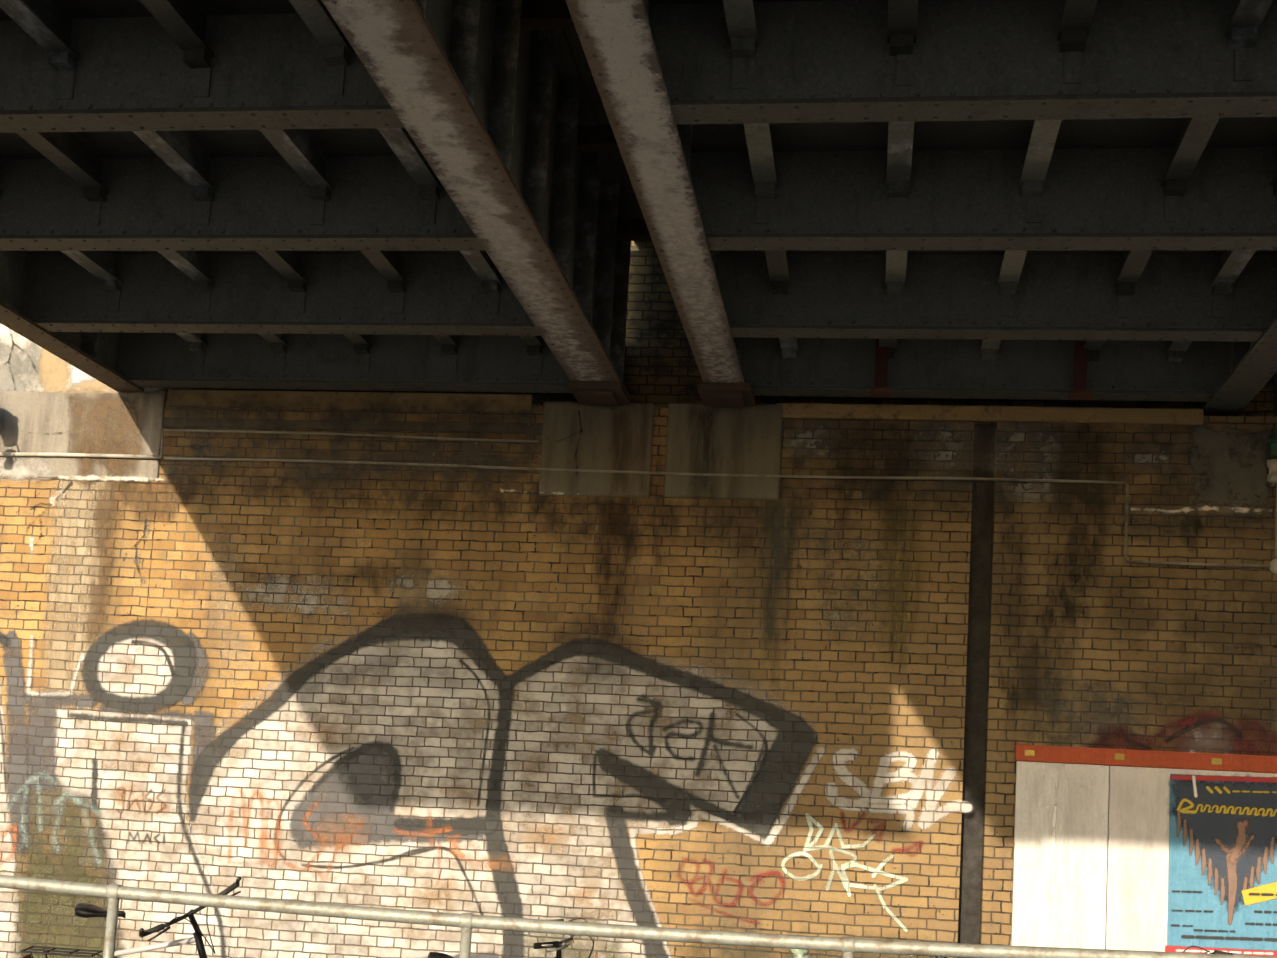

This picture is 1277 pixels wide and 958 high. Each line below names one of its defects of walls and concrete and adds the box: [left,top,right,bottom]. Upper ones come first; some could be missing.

crack [7,335,37,390]